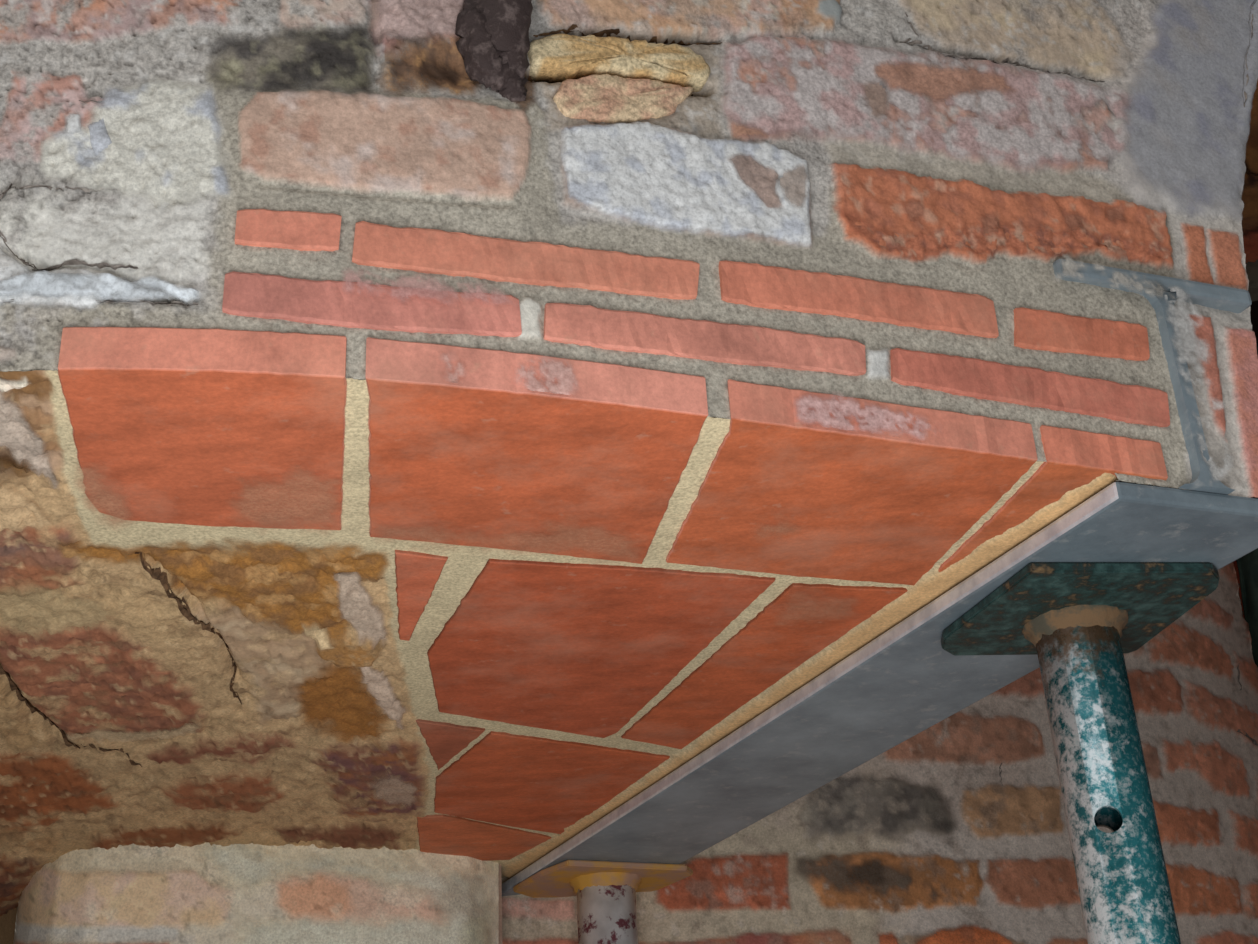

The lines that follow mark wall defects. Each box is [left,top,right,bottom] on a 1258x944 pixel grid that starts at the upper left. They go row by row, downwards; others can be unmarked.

crack [0,183,119,200]
crack [0,231,198,307]
peeling [0,249,198,308]
peeling [0,380,27,392]
crack [135,552,242,705]
crack [0,664,142,767]